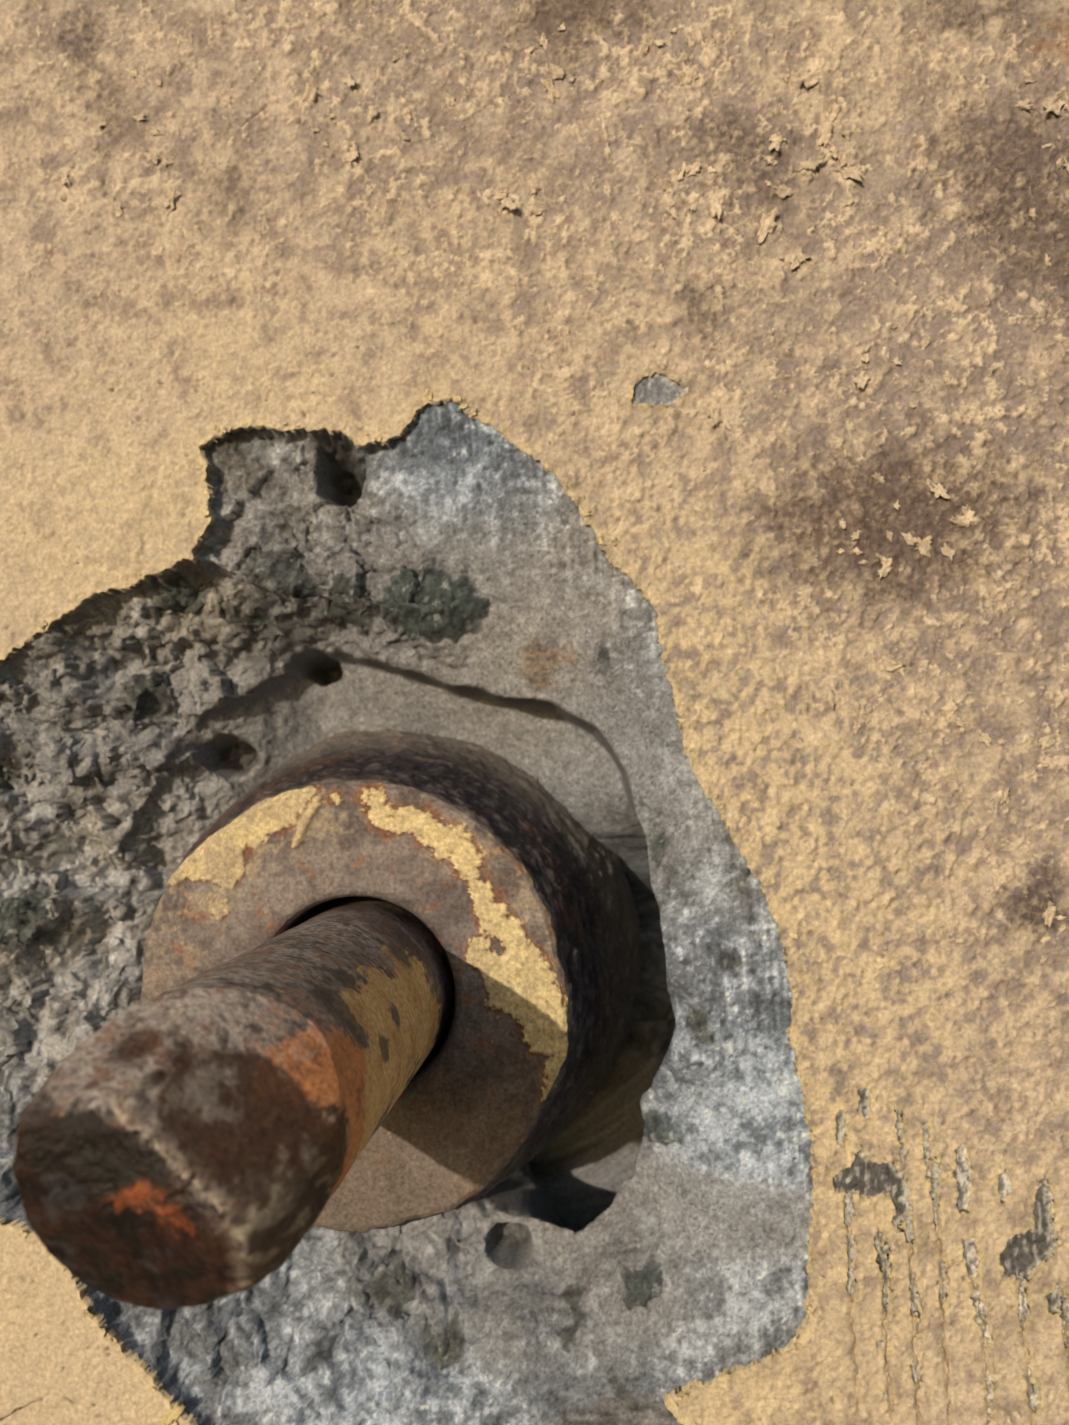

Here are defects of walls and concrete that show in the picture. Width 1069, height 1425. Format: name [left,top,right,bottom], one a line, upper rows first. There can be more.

peeling [631,374,688,406]
peeling [926,478,978,527]
peeling [836,518,955,579]
peeling [941,698,1007,749]
spalling [0,389,825,1425]
peeling [1038,901,1067,965]
peeling [833,1087,913,1314]
peeling [921,1124,972,1230]
peeling [999,1174,1057,1330]
peeling [962,1238,991,1343]
peeling [1045,1284,1069,1347]
peeling [986,1369,1039,1425]